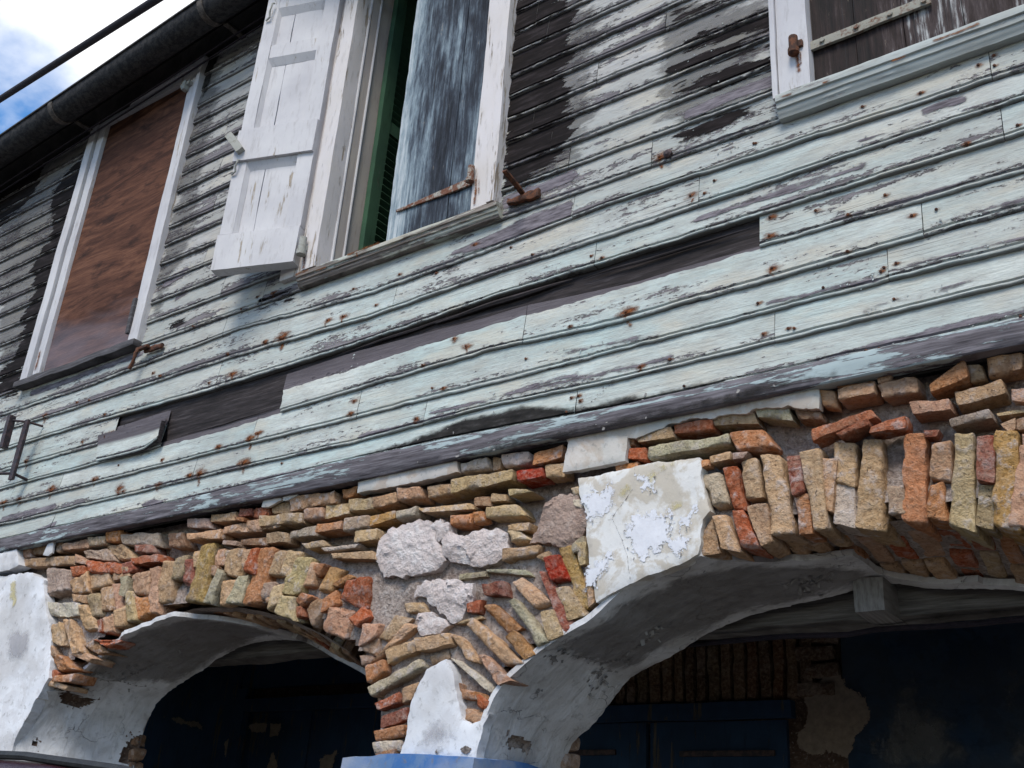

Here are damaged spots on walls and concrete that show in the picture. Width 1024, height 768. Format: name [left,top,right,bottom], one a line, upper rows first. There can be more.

peeling [500,0,580,211]
peeling [664,8,772,144]
peeling [857,90,1014,145]
peeling [693,162,866,222]
peeling [872,176,976,213]
peeling [0,150,144,399]
corrosion [619,306,638,326]
corrosion [237,430,263,472]
peeling [580,479,616,523]
peeling [622,500,699,562]
peeling [584,550,614,590]
flaking render [796,674,871,759]